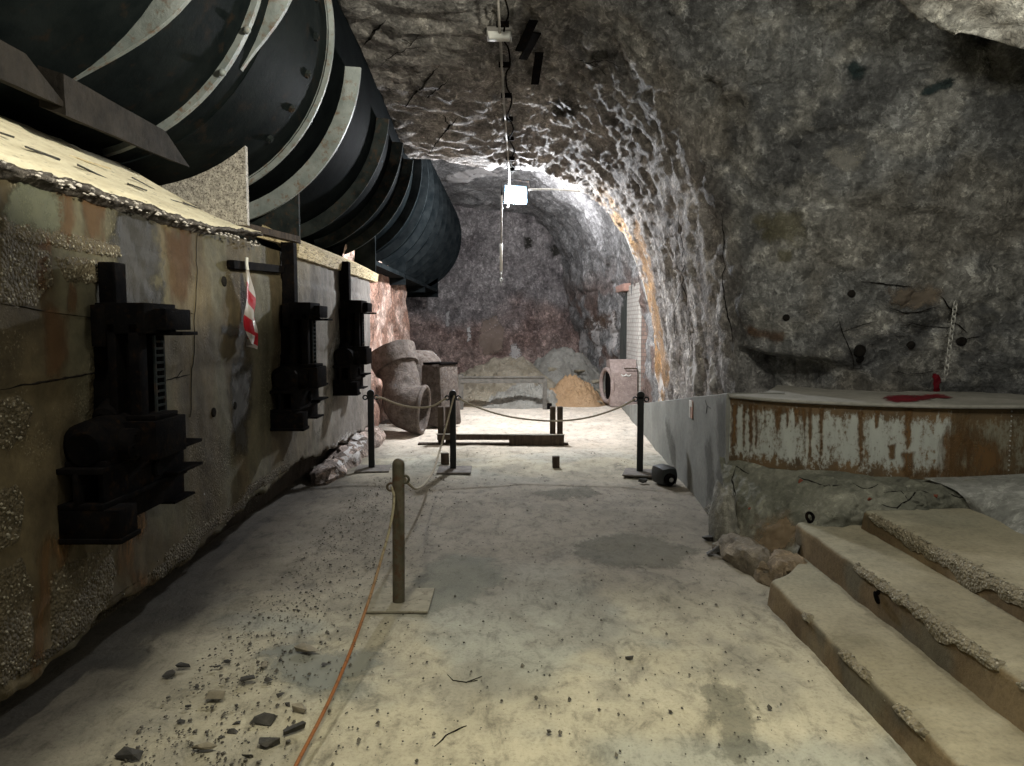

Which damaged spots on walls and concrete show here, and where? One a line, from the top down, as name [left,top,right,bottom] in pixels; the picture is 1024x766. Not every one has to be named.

spalling [0,159,263,309]
crack [1,372,96,390]
corrosion [730,404,824,458]
corrosion [857,410,881,466]
corrosion [888,409,1011,477]
spalling [0,460,298,689]
spalling [868,513,1024,610]
spalling [853,562,1007,672]
spalling [837,649,873,684]
spalling [884,700,929,740]